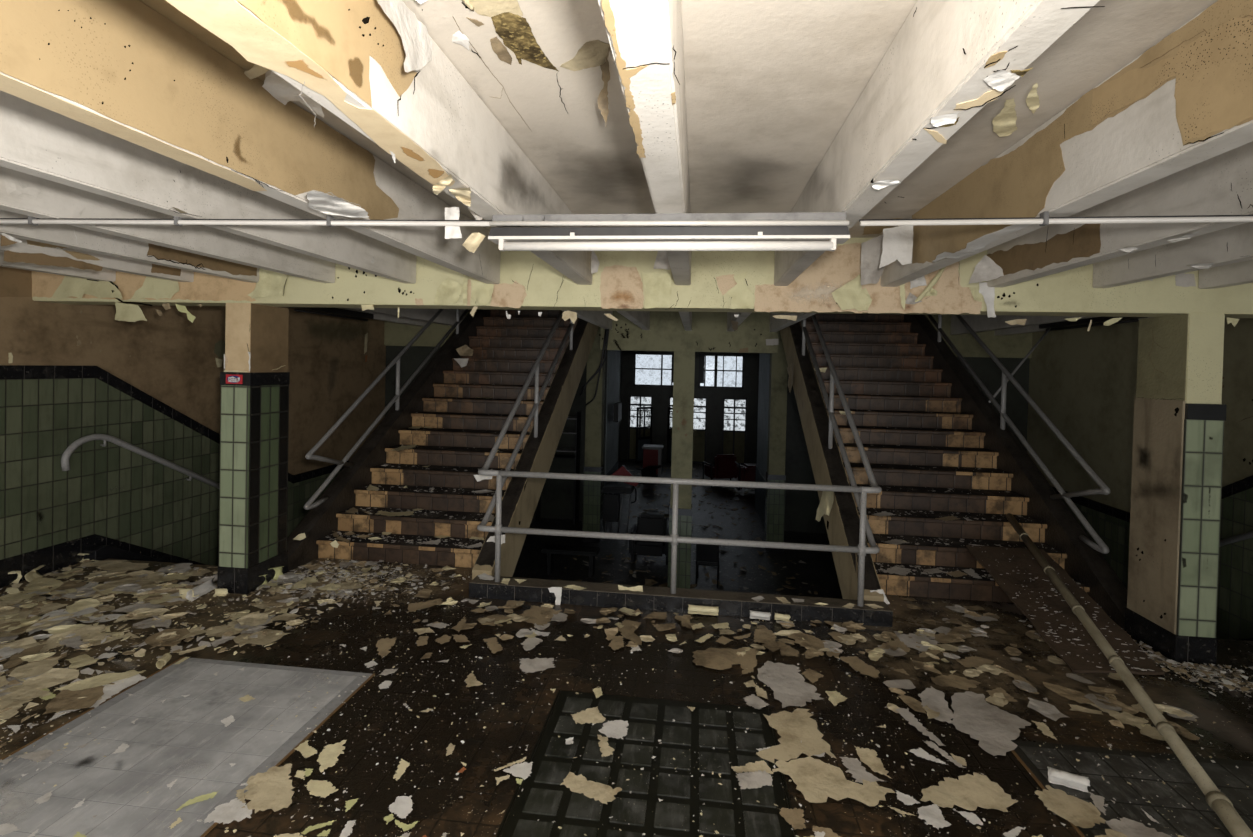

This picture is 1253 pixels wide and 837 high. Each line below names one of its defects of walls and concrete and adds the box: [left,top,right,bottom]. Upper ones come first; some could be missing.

leakage [282,0,333,43]
peeling [0,0,485,253]
peeling [727,0,1253,326]
peeling [0,233,288,323]
peeling [415,275,527,319]
peeling [562,311,577,324]
peeling [591,251,671,321]
peeling [1066,317,1121,331]